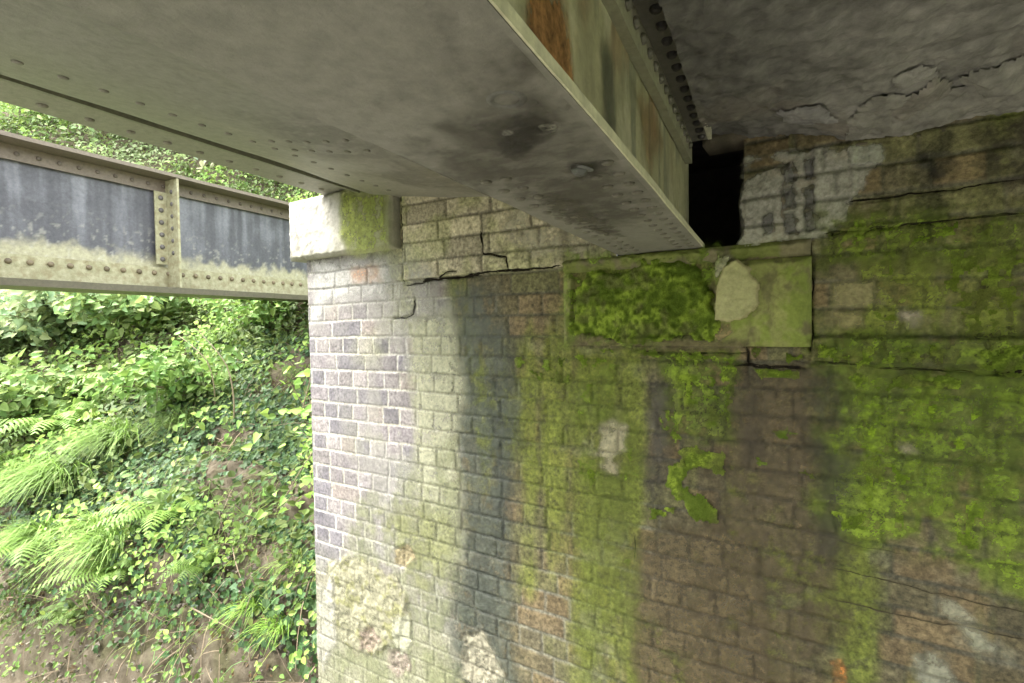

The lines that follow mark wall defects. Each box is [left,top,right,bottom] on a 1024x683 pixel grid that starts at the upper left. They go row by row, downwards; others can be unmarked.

corrosion [528,0,573,81]
peeling [738,56,1024,246]
crack [395,208,561,319]
leakage [566,335,743,352]
spalling [714,257,760,341]
crack [646,213,1023,376]
leakage [832,280,877,328]
leakage [597,422,627,474]
leakage [633,365,846,683]
spalling [317,545,415,676]
leakage [915,653,953,683]
leakage [937,600,1000,652]